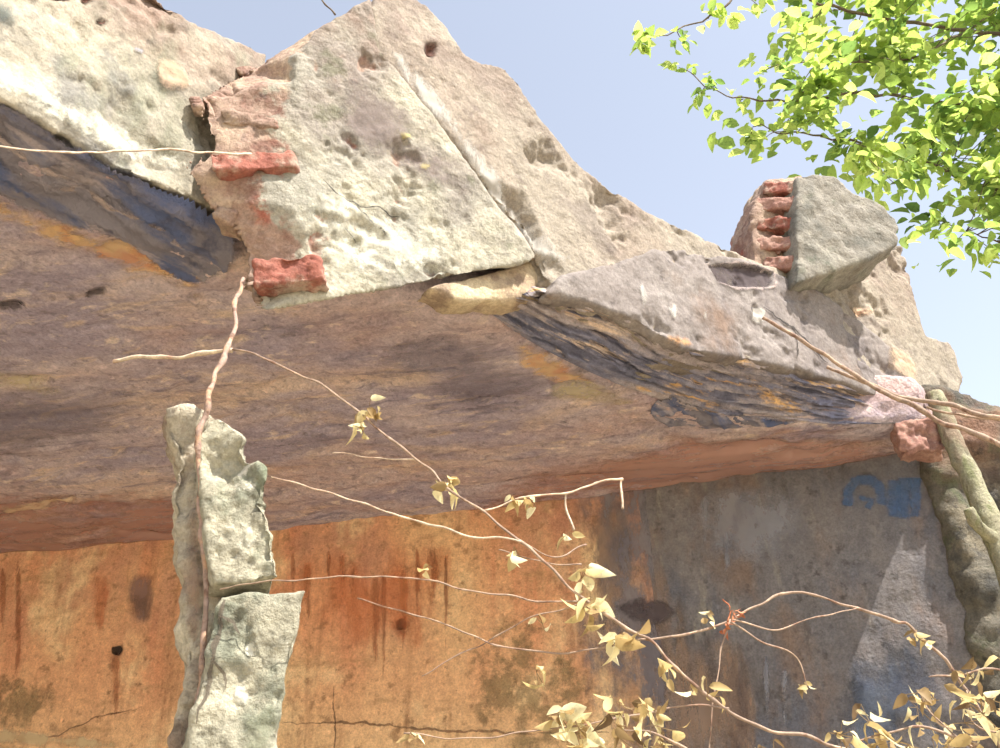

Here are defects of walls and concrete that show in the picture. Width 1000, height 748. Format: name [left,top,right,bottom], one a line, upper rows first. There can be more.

corrosion [0,495,174,553]
corrosion [0,570,20,667]
leakage [130,577,151,620]
corrosion [400,551,419,616]
corrosion [432,551,447,622]
crack [52,709,137,737]
crack [284,687,551,748]